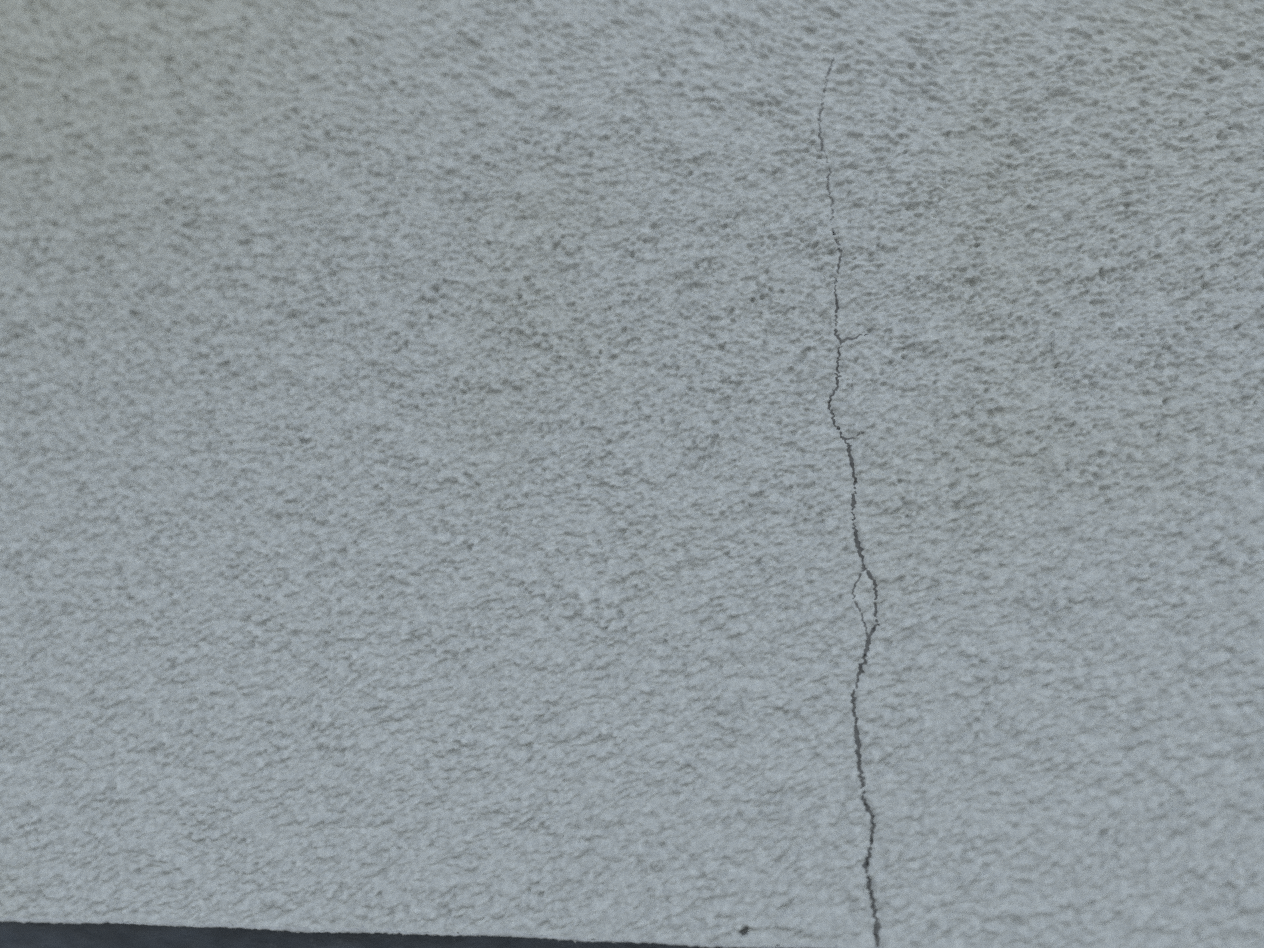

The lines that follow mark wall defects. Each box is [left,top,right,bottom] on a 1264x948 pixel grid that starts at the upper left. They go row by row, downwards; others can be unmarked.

crack [818,57,881,947]